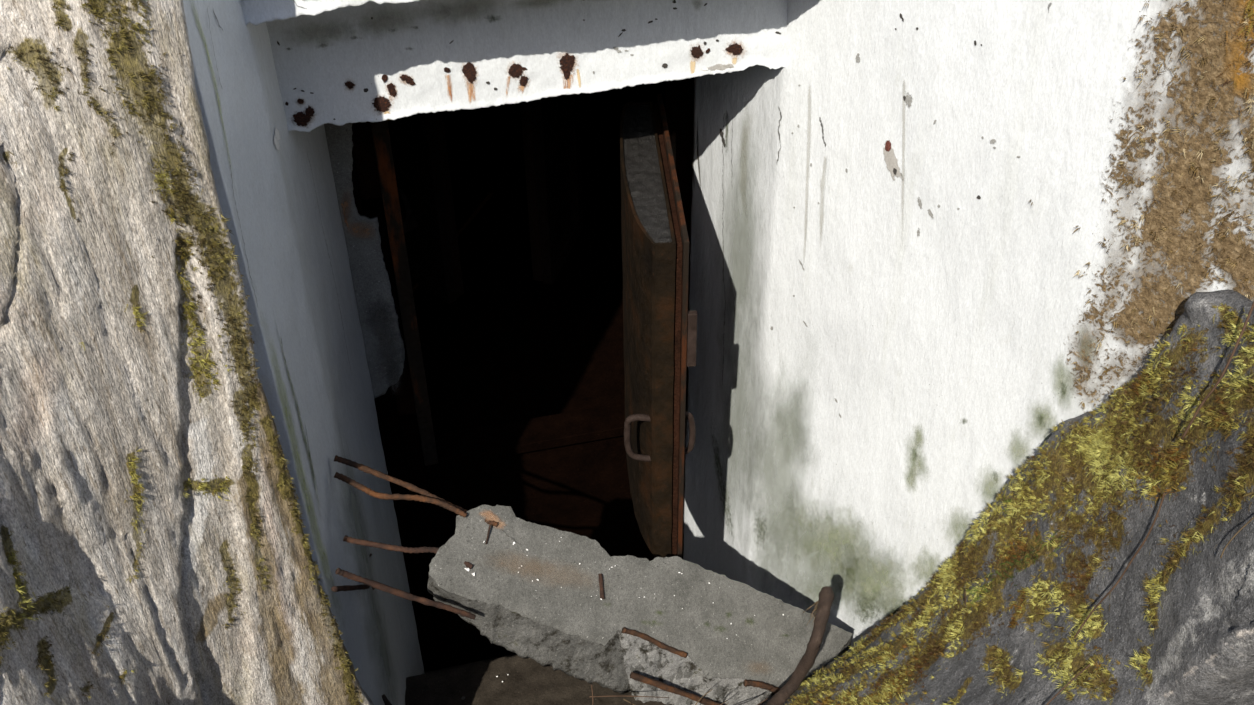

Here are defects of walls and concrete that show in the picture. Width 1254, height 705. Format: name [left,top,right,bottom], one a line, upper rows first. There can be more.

rust [345,74,415,114]
rust [444,62,528,102]
rust [559,53,581,89]
rust [691,39,743,73]
leakage [730,200,752,317]
leakage [727,362,802,525]
spalling [334,455,469,518]
leakage [767,528,888,602]
spalling [335,535,780,705]
spalling [800,636,852,685]